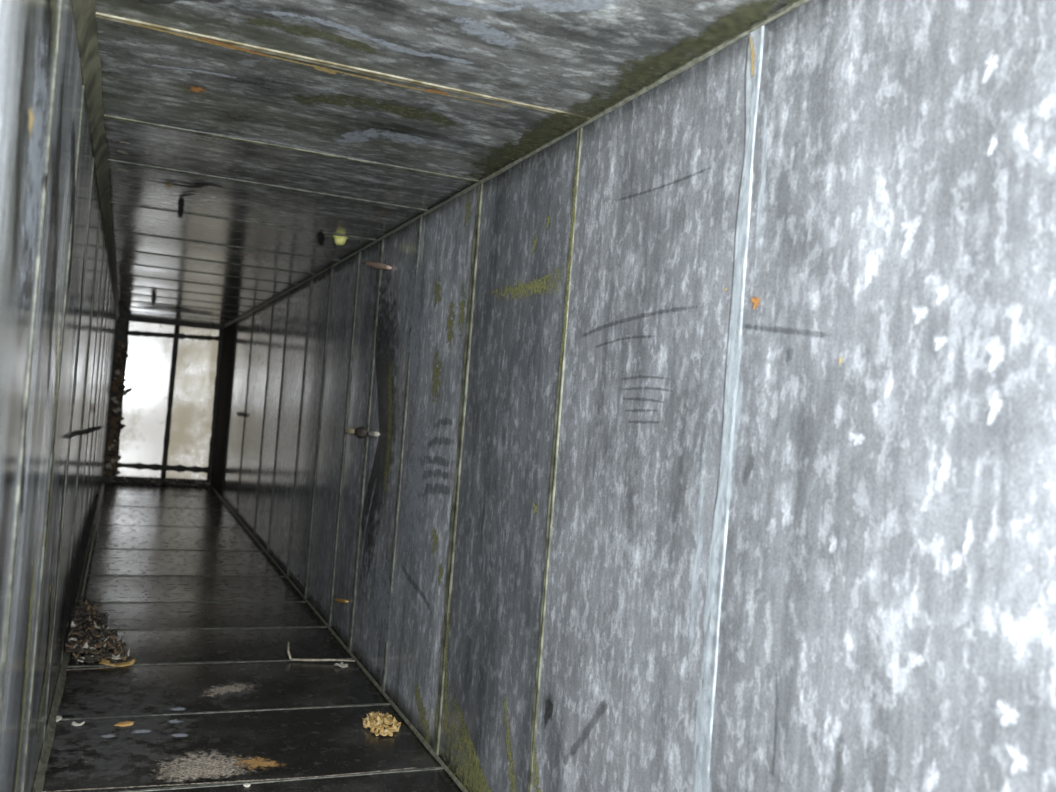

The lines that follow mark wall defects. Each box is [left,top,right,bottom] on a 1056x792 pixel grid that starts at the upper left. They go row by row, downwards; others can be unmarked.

leakage [533,699,553,792]
leakage [689,38,767,792]